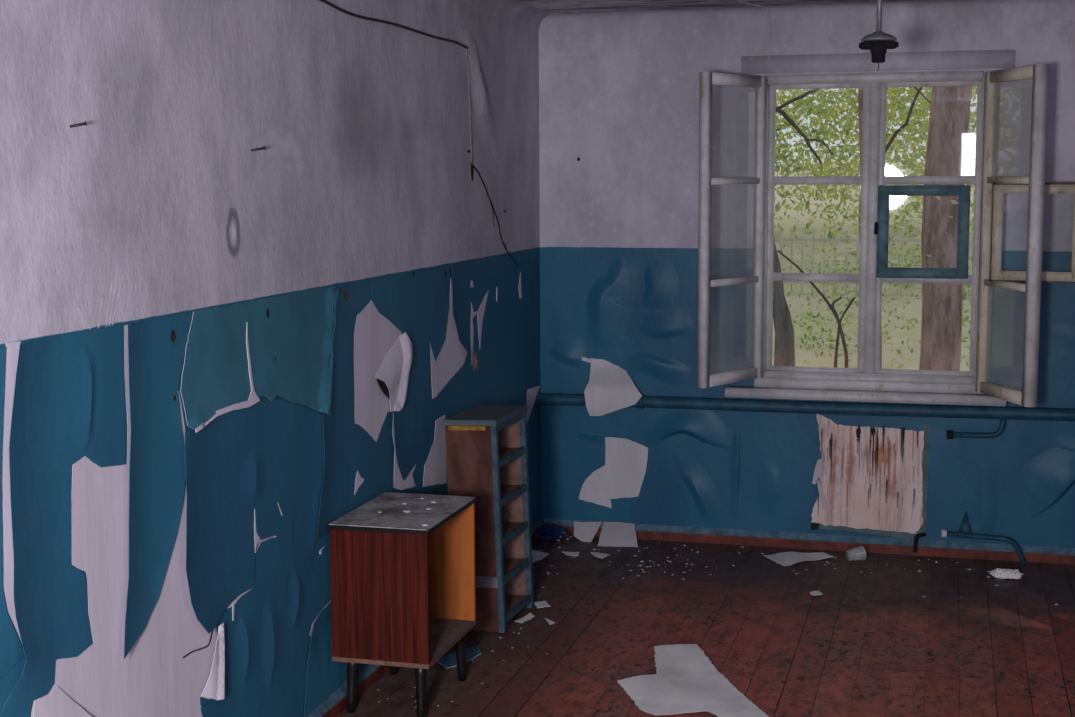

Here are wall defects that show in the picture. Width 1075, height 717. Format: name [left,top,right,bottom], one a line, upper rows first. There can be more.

peeling [811,414,930,540]